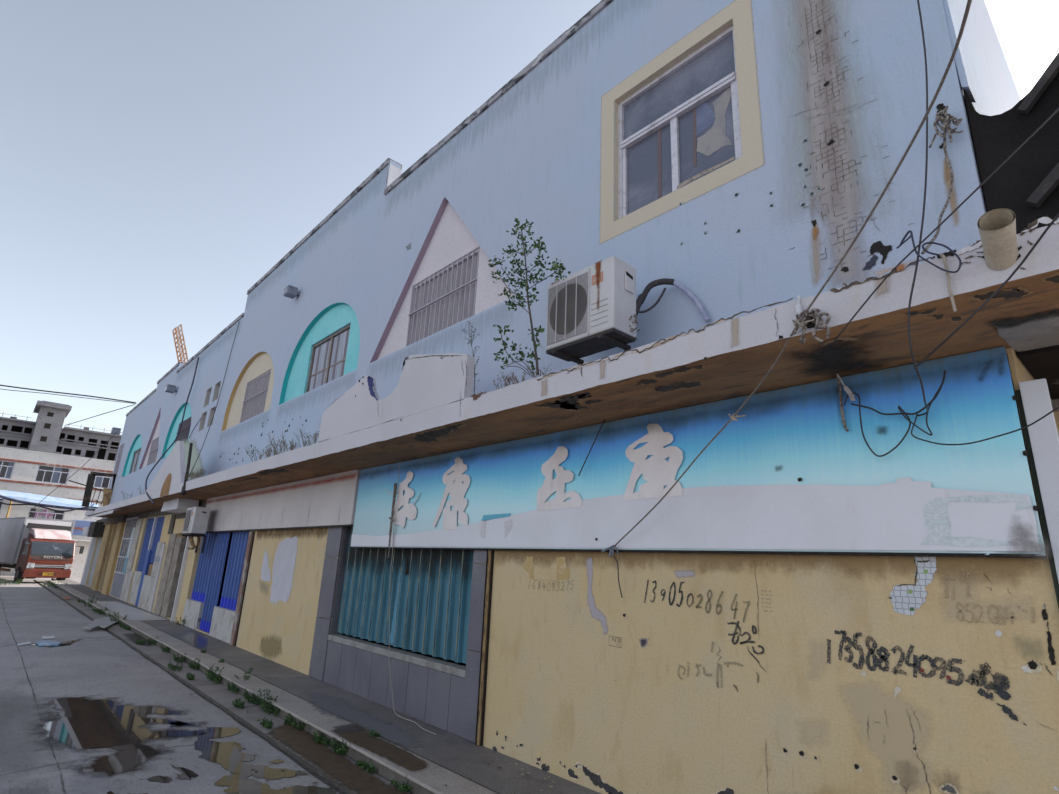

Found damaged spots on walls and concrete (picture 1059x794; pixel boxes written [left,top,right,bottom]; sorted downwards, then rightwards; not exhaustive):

water stain [790,0,864,283]
spalling [862,241,892,270]
peeling [358,376,377,400]
peeling [533,357,707,411]
peeling [413,423,466,443]
crack [867,708,931,794]
peeling [536,756,624,794]